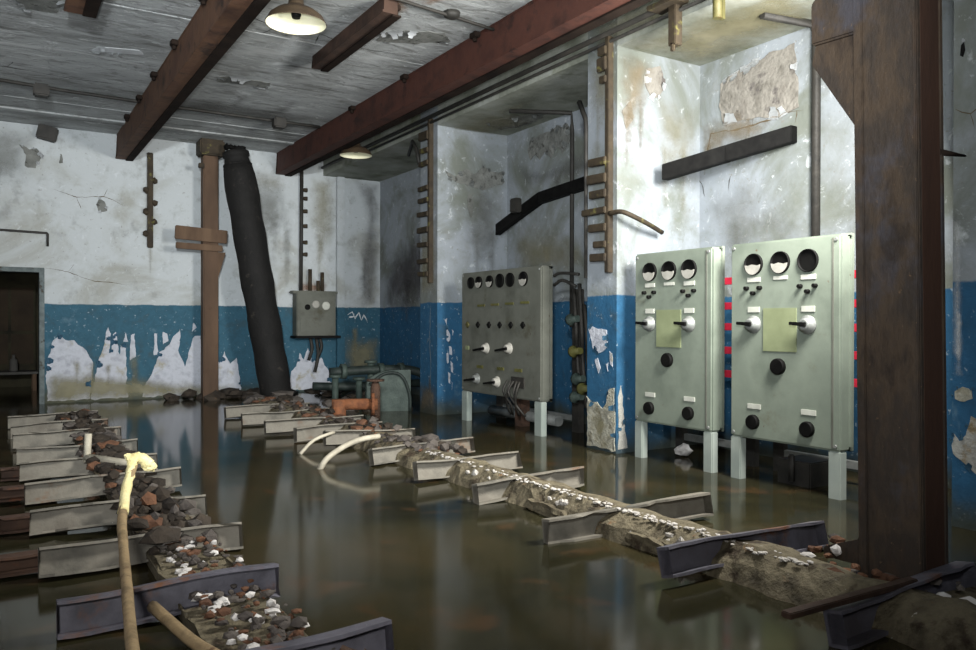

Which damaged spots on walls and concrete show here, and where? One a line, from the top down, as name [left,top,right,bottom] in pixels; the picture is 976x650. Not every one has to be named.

peeling [9,0,65,13]
flaking render [719,43,799,126]
peeling [45,328,136,401]
peeling [142,323,201,397]
peeling [218,352,242,390]
peeling [290,349,332,390]
peeling [445,318,453,384]
peeling [588,323,613,373]
flaking render [586,385,627,452]
peeling [949,416,976,474]
flaking render [951,386,975,402]